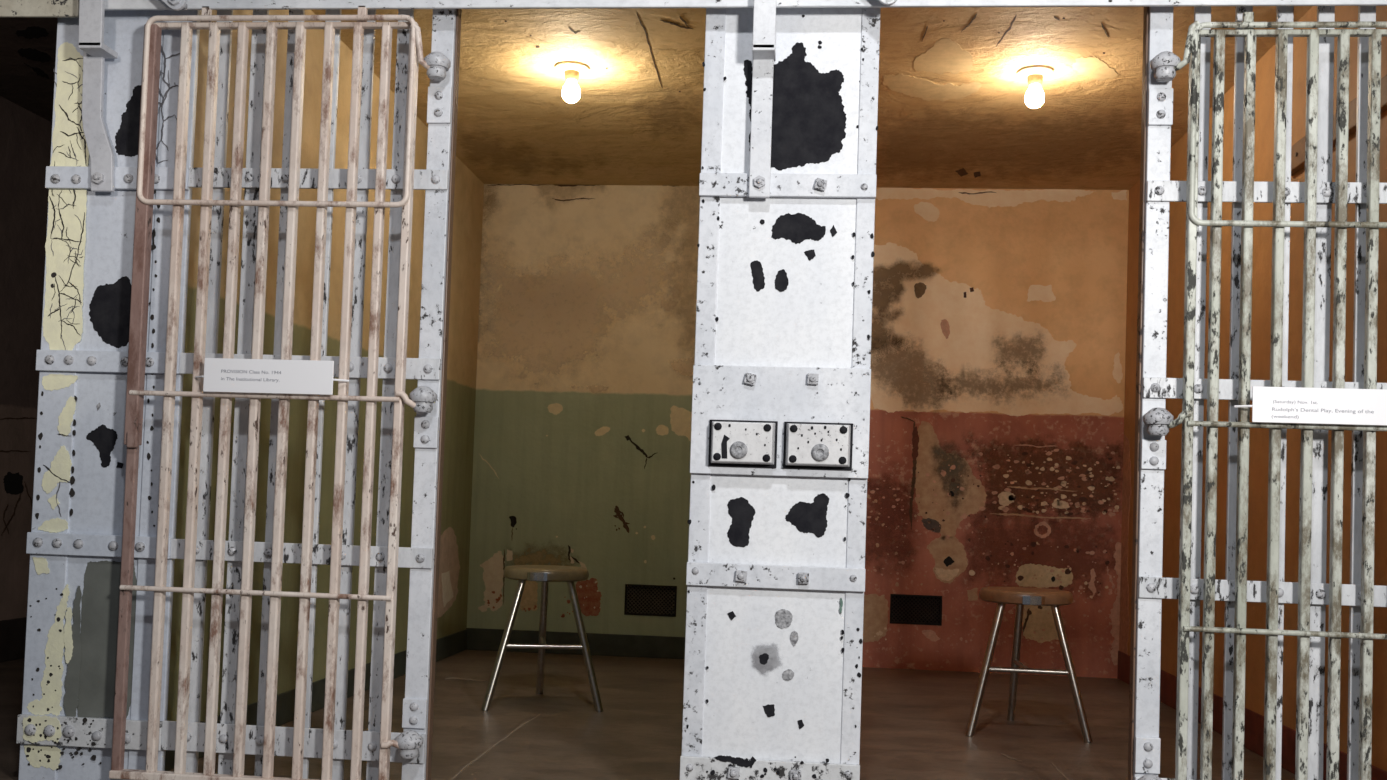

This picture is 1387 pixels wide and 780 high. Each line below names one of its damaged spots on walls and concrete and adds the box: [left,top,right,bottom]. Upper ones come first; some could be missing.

crack [637,14,693,92]
peeling [743,60,753,151]
peeling [771,41,860,171]
peeling [89,276,132,348]
spalling [149,190,160,348]
water stain [871,262,947,407]
crack [0,42,106,770]
peeling [760,213,1123,677]
peeling [478,551,505,612]
peeling [520,581,538,612]
spalling [752,609,799,681]
spalling [763,704,775,717]